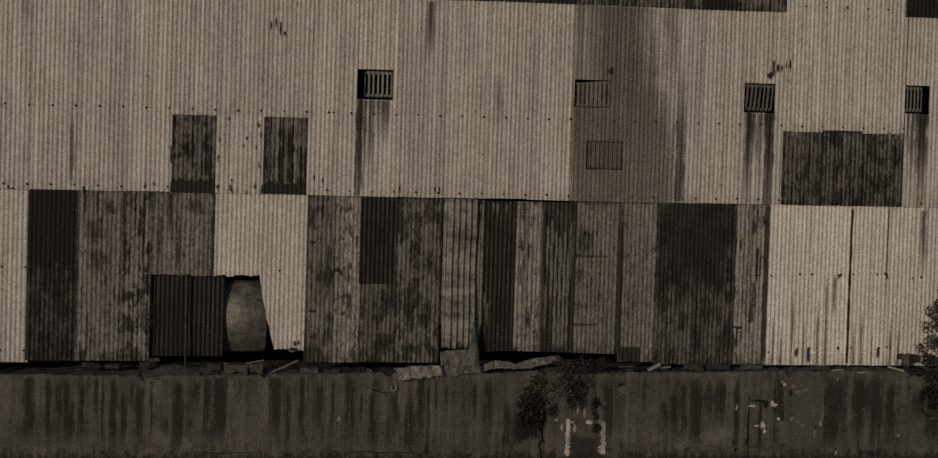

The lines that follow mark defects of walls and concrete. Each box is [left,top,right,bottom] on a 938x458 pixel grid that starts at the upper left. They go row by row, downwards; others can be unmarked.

corrosion [354,99,389,183]
corrosion [744,113,775,191]
corrosion [907,114,929,165]
corrosion [656,203,742,306]
water stain [23,378,192,452]
water stain [194,379,234,430]
water stain [260,378,334,435]
water stain [660,384,762,450]
water stain [823,382,895,435]